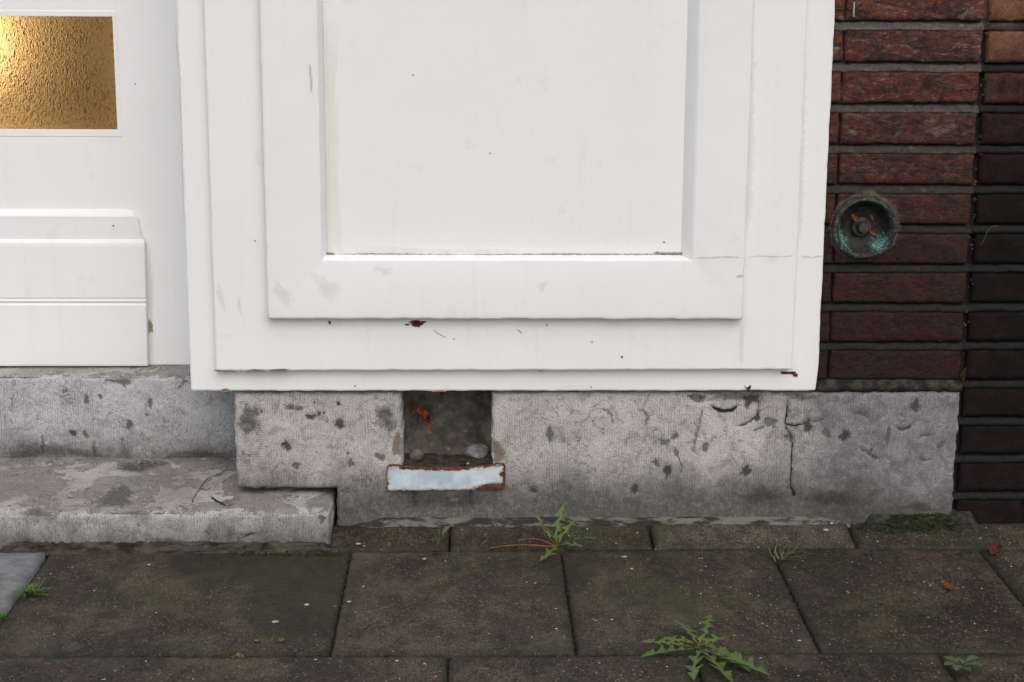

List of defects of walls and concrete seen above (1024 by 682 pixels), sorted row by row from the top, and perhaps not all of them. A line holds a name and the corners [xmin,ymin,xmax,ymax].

crack [711,400,824,496]